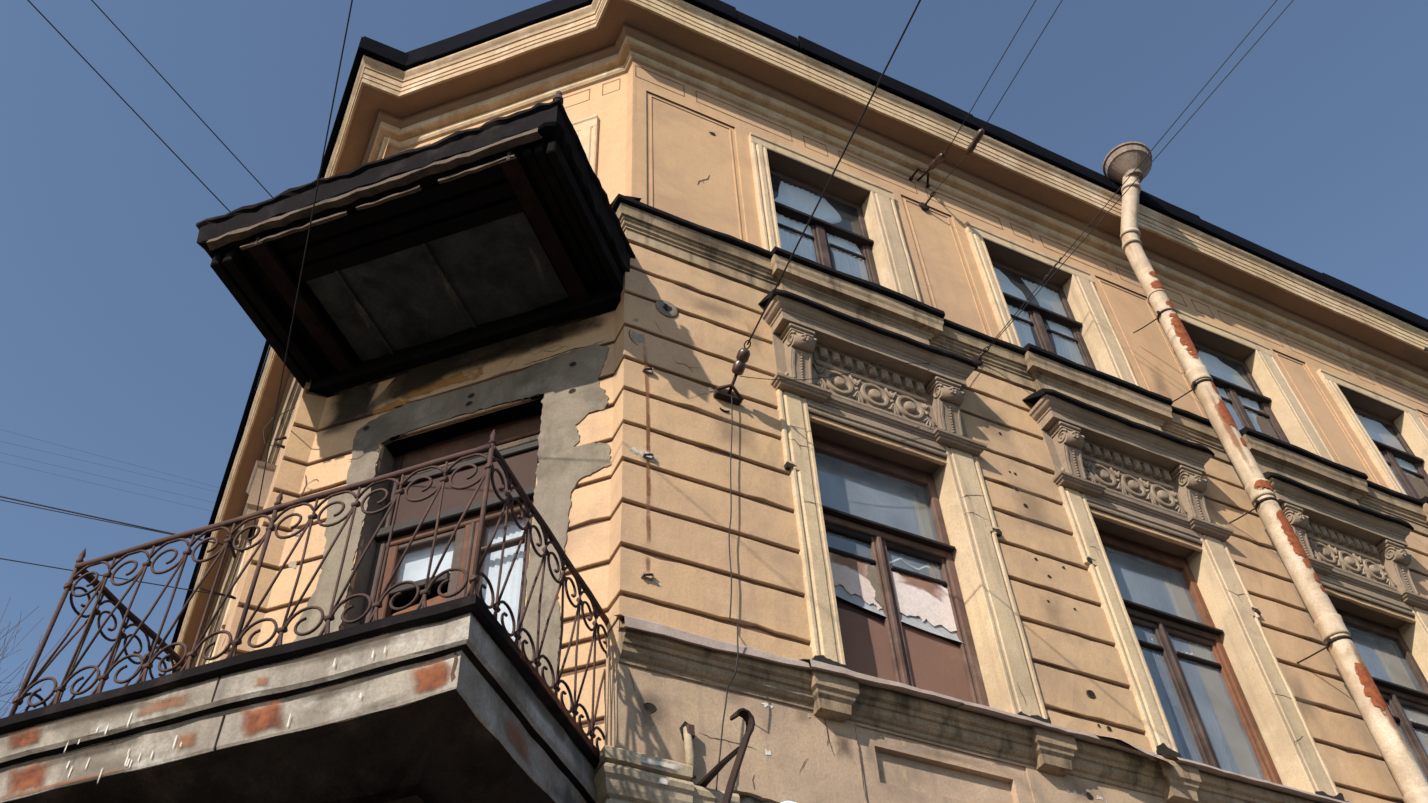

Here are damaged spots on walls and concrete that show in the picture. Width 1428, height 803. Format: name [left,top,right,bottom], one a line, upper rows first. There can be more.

rust [1149,271,1198,358]
peeling [372,368,483,414]
rust [1211,381,1247,453]
rust [1254,479,1326,592]